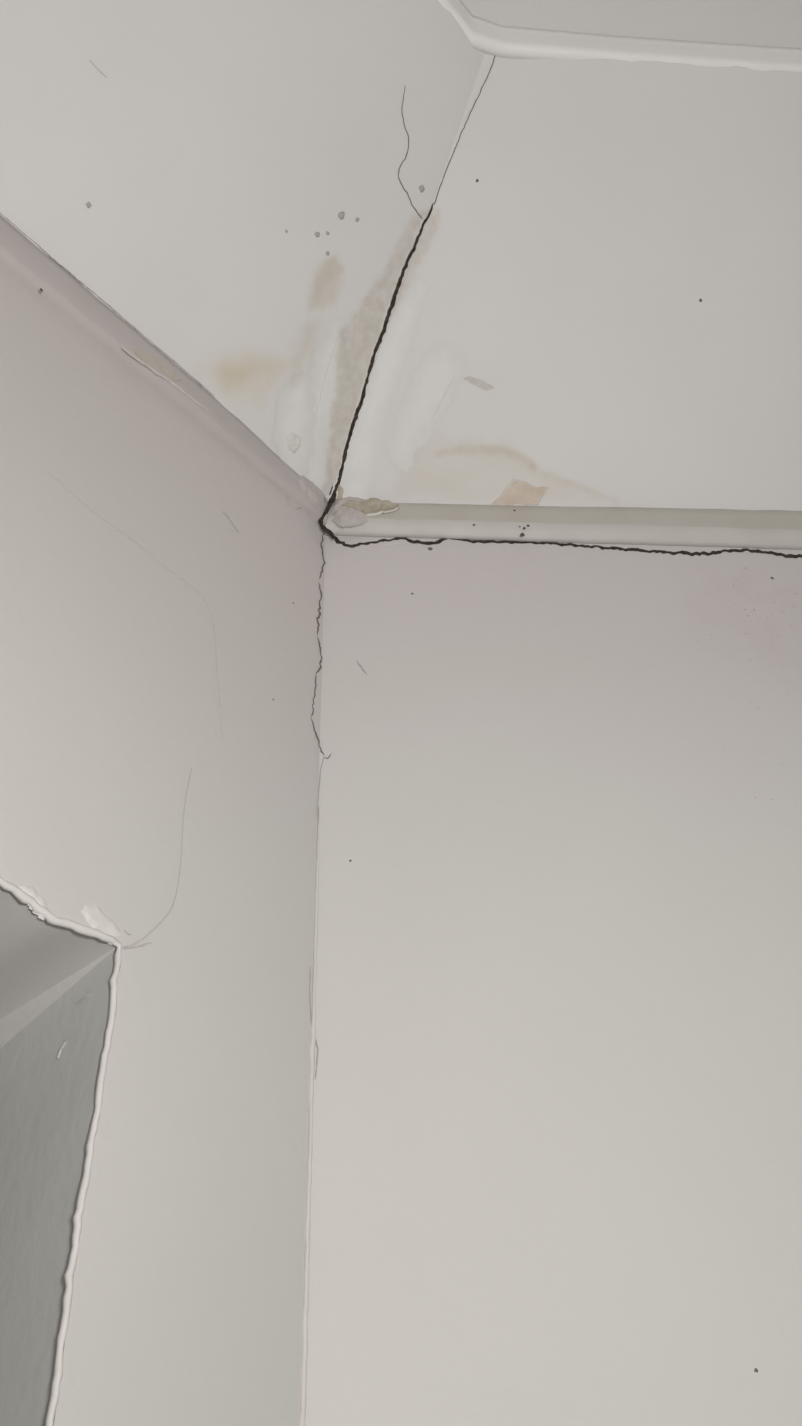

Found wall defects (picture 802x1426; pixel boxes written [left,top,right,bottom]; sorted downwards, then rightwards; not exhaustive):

crack [311,56,802,812]
crack [309,966,319,1080]